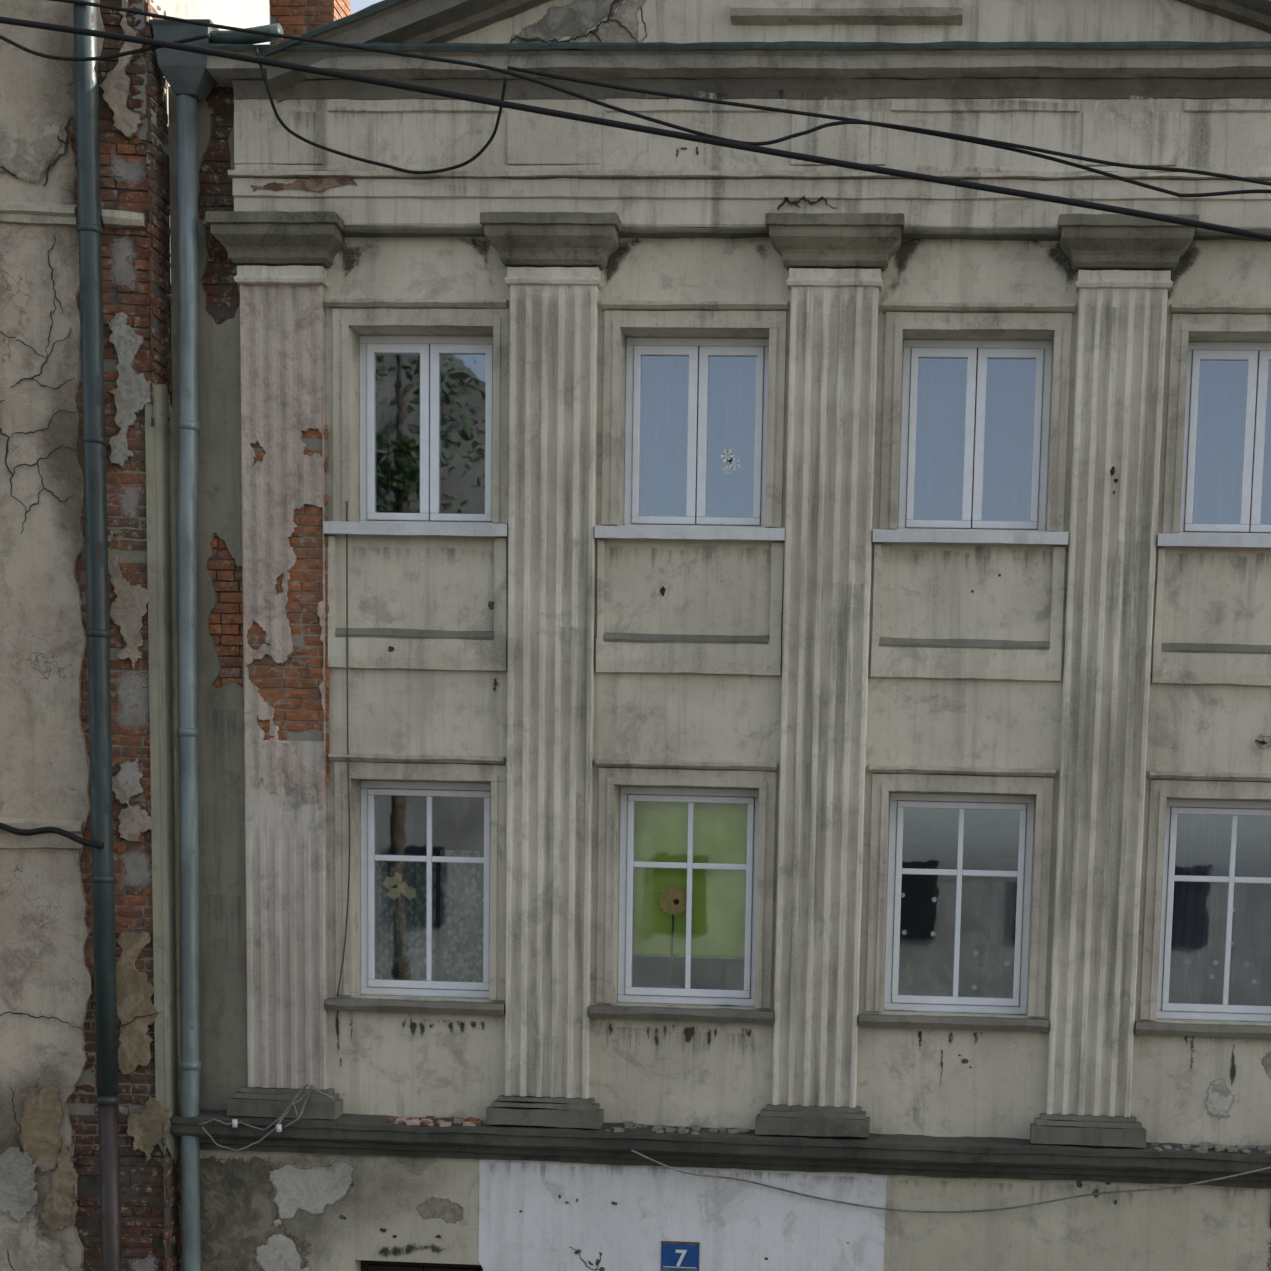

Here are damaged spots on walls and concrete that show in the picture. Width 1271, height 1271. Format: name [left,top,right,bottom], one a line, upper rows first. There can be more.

peeling [99,0,143,139]
crack [510,0,647,43]
crack [0,235,77,534]
peeling [109,312,152,467]
flaking render [302,425,328,471]
peeling [108,528,150,669]
flaking render [207,494,330,784]
peeling [112,759,153,842]
flaking render [0,1086,79,1271]
peeling [126,1097,172,1162]
flaking render [200,1156,356,1271]
crack [569,1247,601,1271]